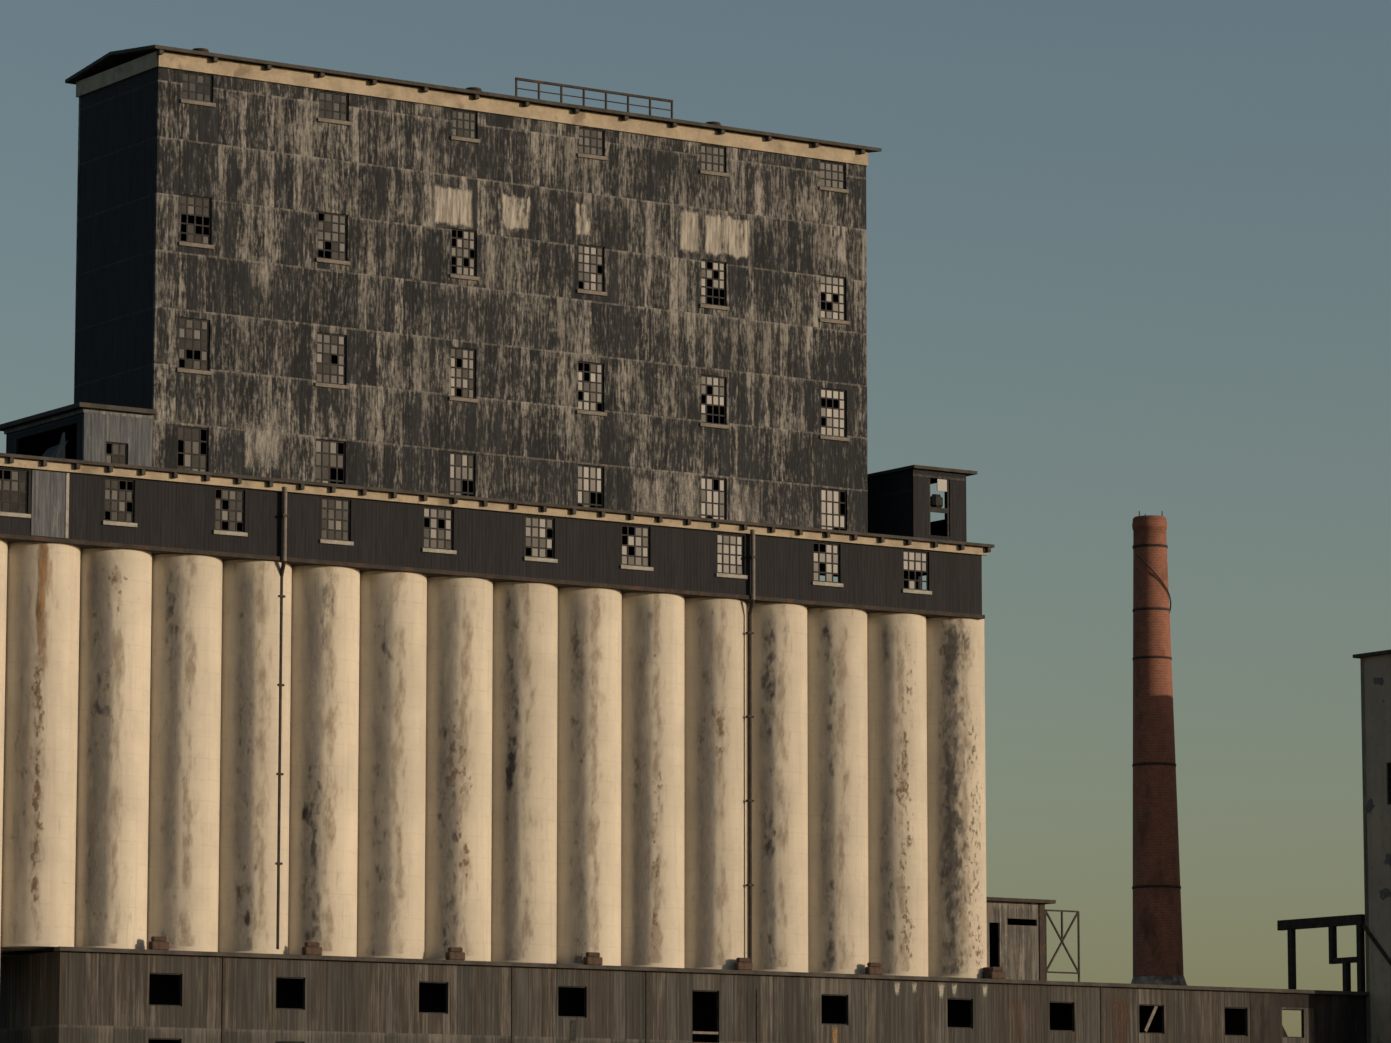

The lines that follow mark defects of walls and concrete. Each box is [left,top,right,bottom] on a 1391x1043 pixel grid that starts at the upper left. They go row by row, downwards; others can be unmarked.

corrosion [37,543,47,644]
water stain [88,566,110,946]
water stain [303,722,331,941]
water stain [506,659,528,961]
water stain [762,654,776,969]
water stain [940,629,968,995]